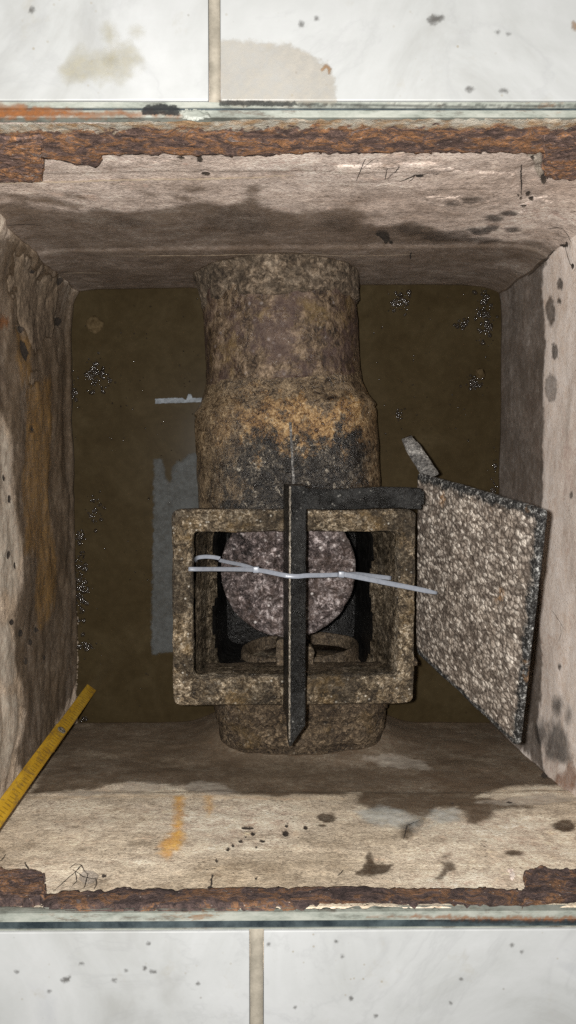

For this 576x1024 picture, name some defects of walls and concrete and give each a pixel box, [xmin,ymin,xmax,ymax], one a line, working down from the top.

damp [0,190,563,780]
damp [34,580,566,834]
damp [356,853,391,875]
damp [554,820,575,831]